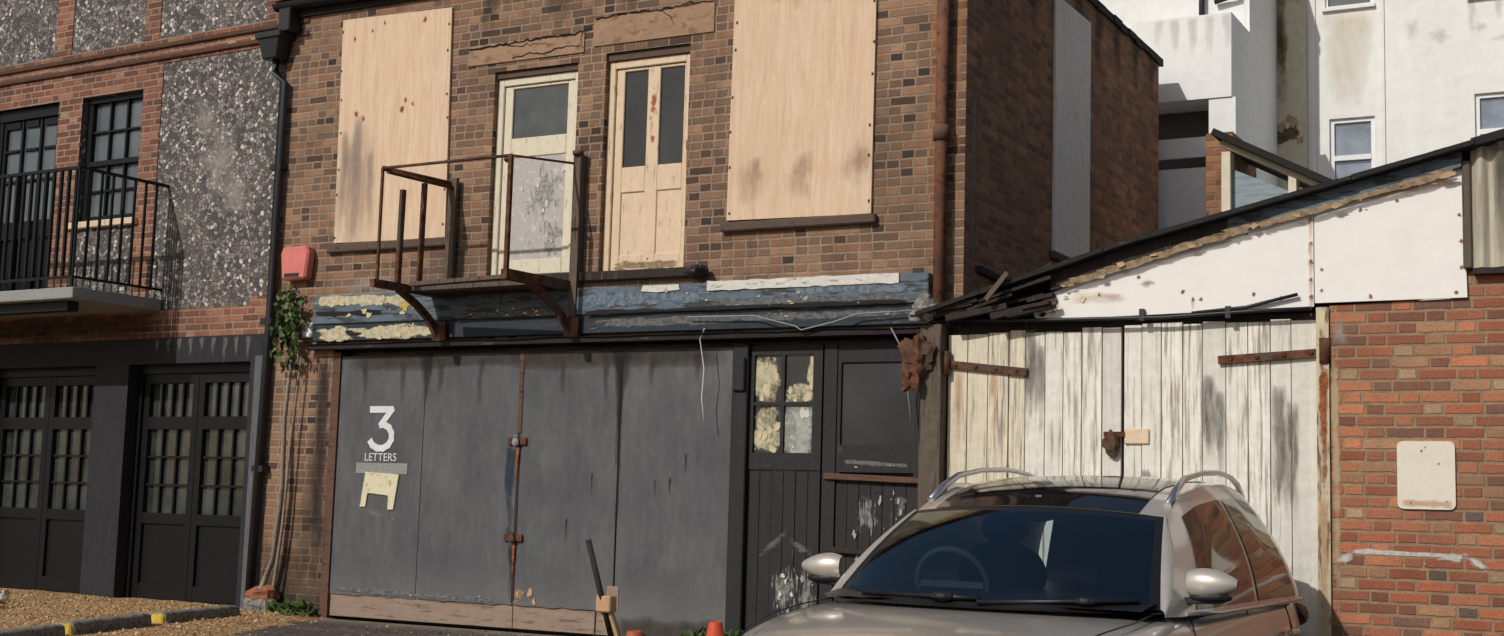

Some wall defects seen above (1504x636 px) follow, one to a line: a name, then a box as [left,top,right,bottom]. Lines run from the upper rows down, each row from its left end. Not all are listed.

crack [469,0,713,58]
peeling [614,257,677,270]
peeling [315,294,431,342]
peeling [583,282,917,327]
peeling [754,356,814,453]
leakage [1274,392,1297,475]
peeling [852,490,907,561]
peeling [771,568,816,616]